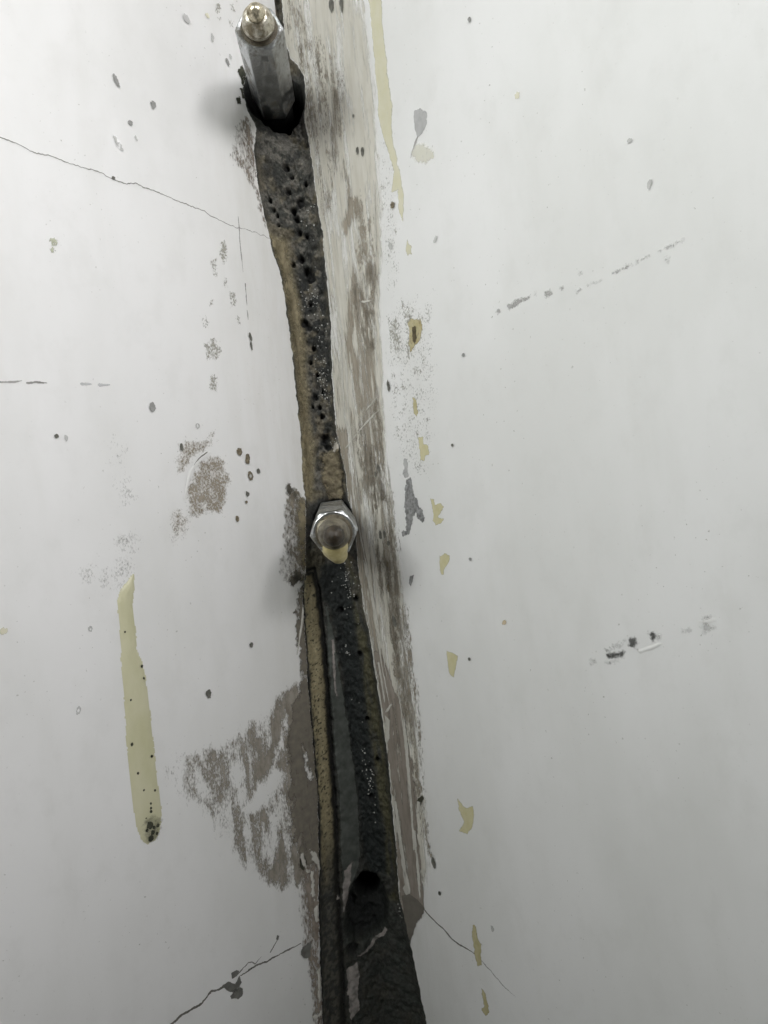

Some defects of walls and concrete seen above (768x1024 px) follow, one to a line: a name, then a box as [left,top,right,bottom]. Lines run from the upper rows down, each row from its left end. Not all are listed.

peeling [411,109,427,156]
crack [0,0,512,1024]
peeling [402,459,425,536]